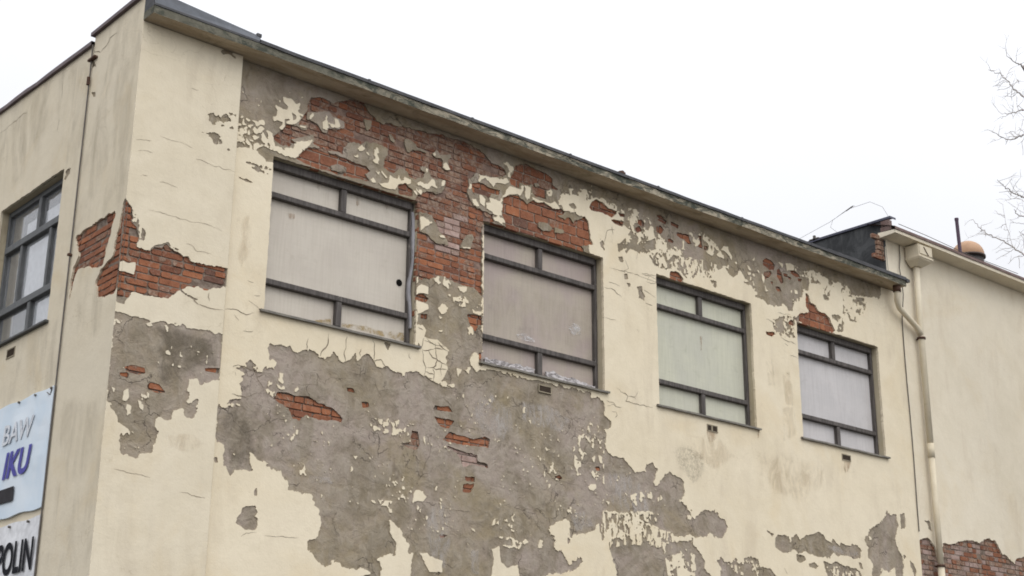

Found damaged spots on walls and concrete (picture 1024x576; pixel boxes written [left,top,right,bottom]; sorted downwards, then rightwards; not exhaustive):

flaking render [870,233,885,261]
peeling [71,201,226,459]
crack [409,328,473,430]
peeling [206,50,881,576]
flaking render [767,511,1024,576]